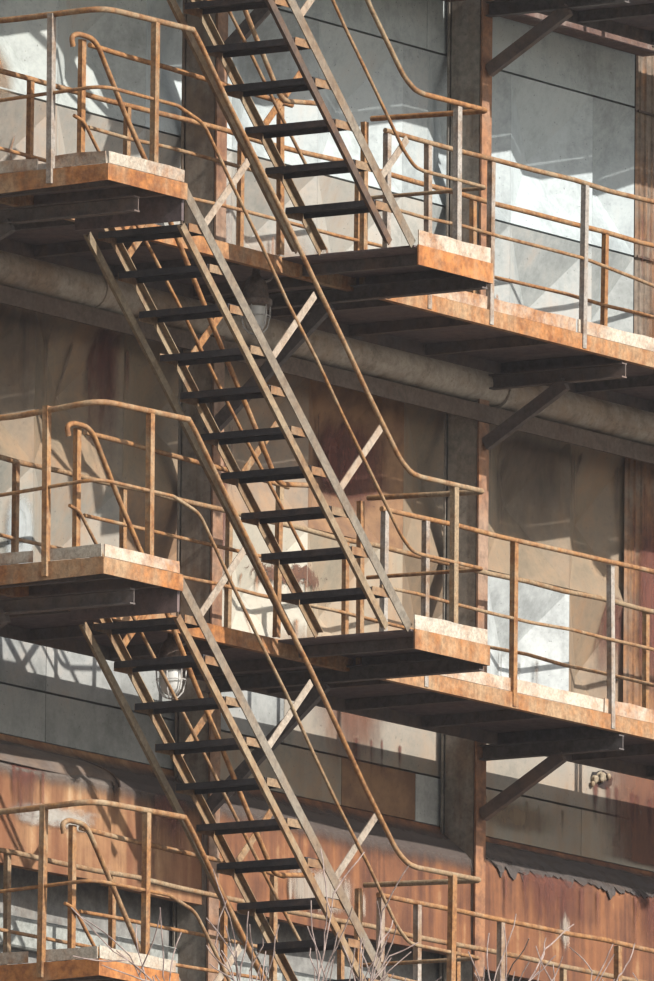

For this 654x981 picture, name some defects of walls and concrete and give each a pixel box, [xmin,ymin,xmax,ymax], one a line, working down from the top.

rust [318,415,382,501]
rust [634,491,654,678]
rust [155,797,183,835]